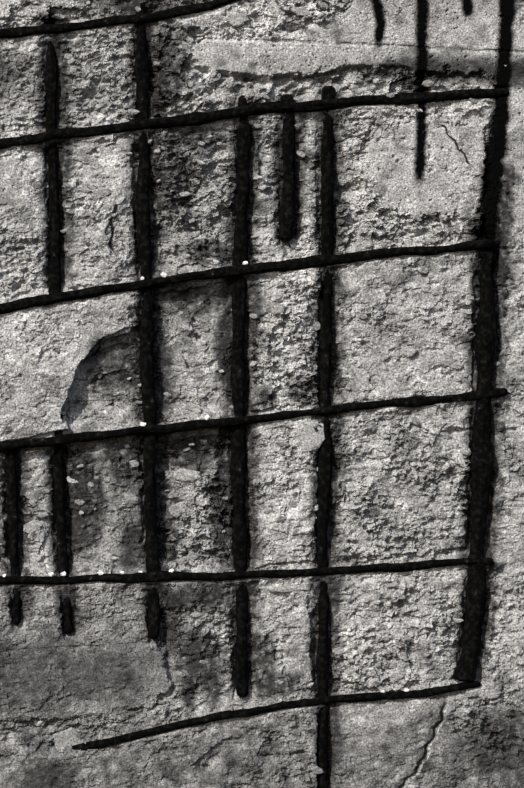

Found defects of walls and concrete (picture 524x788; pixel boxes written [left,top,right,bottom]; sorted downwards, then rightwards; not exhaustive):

spalling [0,0,212,128]
spalling [0,136,51,244]
spalling [0,254,50,304]
spalling [59,118,239,425]
spalling [148,0,524,757]
spalling [0,290,324,788]
crack [399,702,445,788]